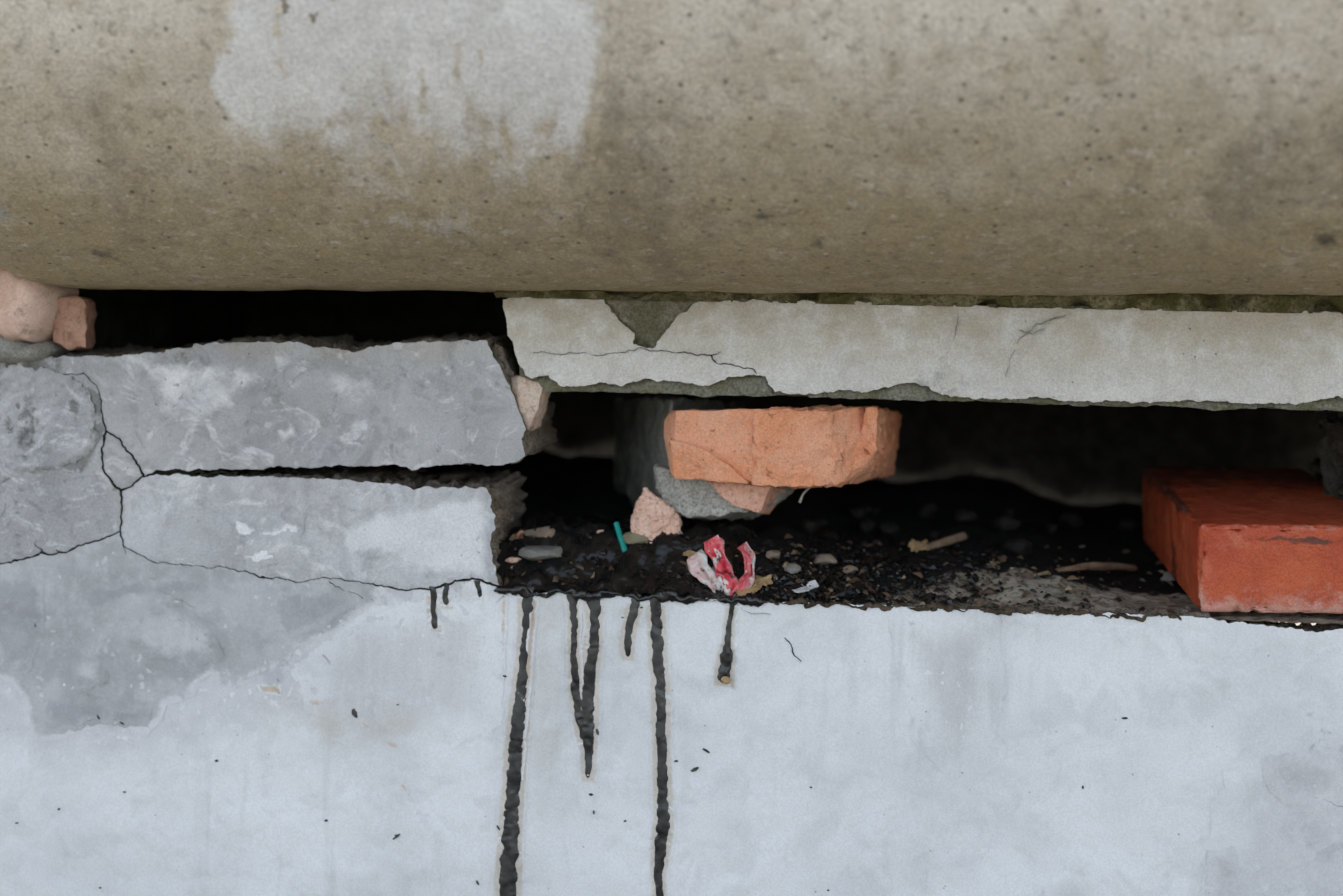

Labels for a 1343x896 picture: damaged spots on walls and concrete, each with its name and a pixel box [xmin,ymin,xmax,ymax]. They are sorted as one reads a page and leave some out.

crack [533,347,757,374]
crack [0,373,499,620]